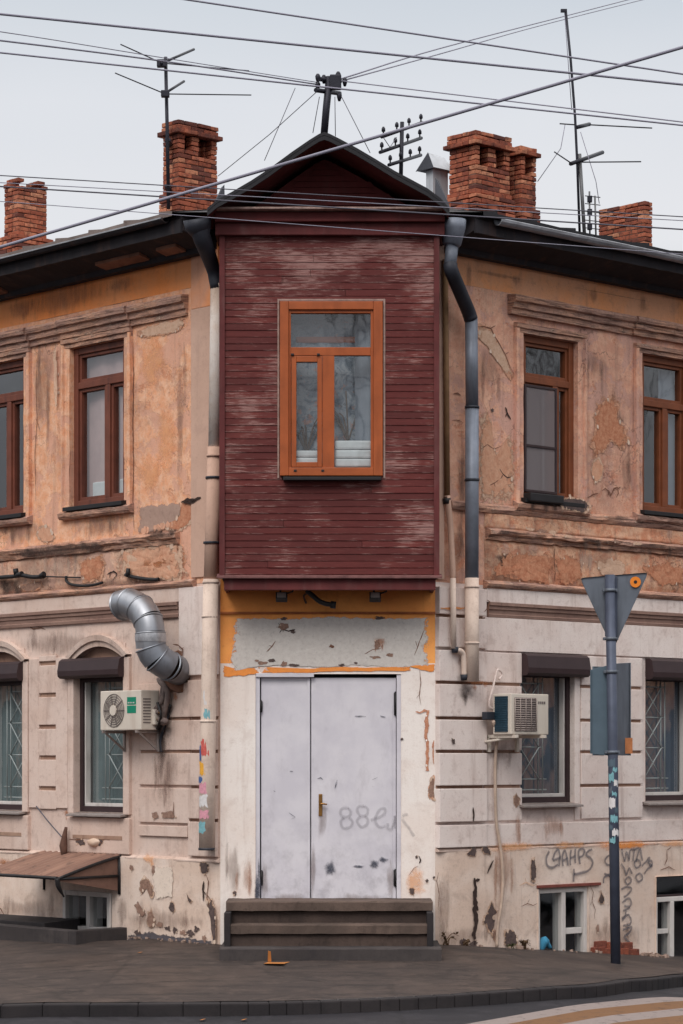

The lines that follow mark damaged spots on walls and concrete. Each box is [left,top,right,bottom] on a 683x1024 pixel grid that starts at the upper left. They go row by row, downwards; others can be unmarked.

crack [479,326,514,374]
spalling [589,391,632,484]
spalling [78,501,191,584]
spalling [594,558,629,576]
peeling [415,709,436,801]
spalling [467,846,491,857]
spalling [129,865,216,945]
spalling [482,900,518,948]